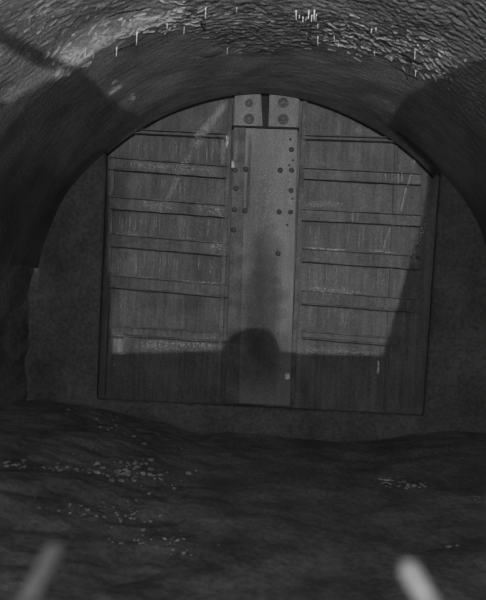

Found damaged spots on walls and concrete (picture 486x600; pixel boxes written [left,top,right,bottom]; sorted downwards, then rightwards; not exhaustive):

peeling [18,0,453,90]